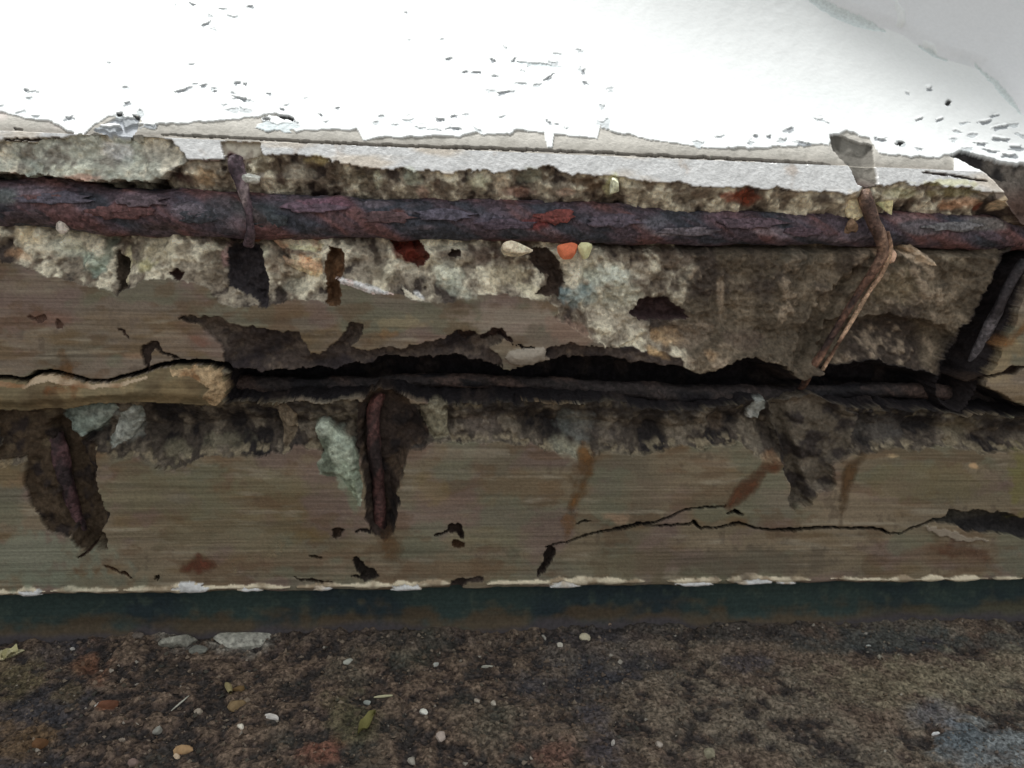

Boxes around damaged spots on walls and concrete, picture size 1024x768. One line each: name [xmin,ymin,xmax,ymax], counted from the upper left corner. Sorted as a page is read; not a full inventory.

spalling [0,79,1024,225]
rust [0,191,220,226]
rust [280,202,350,213]
rust [416,208,476,221]
rust [532,209,576,226]
rust [587,213,789,236]
rust [734,189,758,205]
rust [921,221,985,232]
spalling [0,226,1024,472]
crack [0,341,238,384]
crack [545,505,935,548]